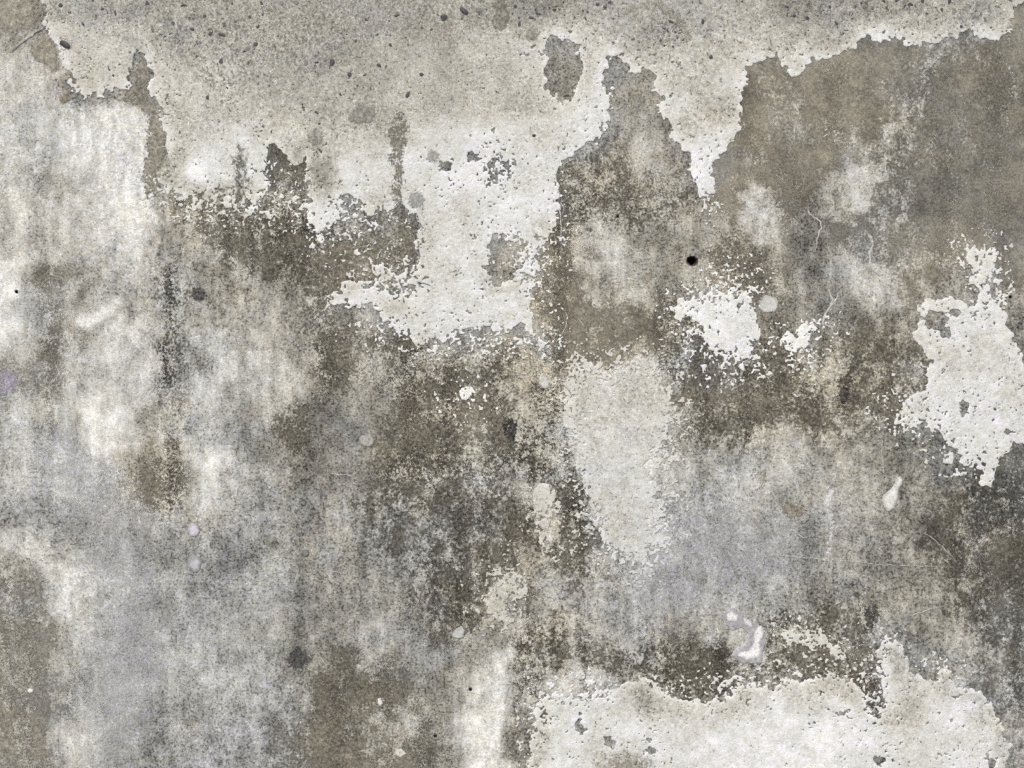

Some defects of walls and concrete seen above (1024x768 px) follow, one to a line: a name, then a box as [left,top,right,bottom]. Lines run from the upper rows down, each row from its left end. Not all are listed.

leakage [121,59,931,727]
peeling [41,0,1024,539]
leakage [691,4,1024,314]
peeling [515,612,1013,768]
leakage [916,444,1024,768]